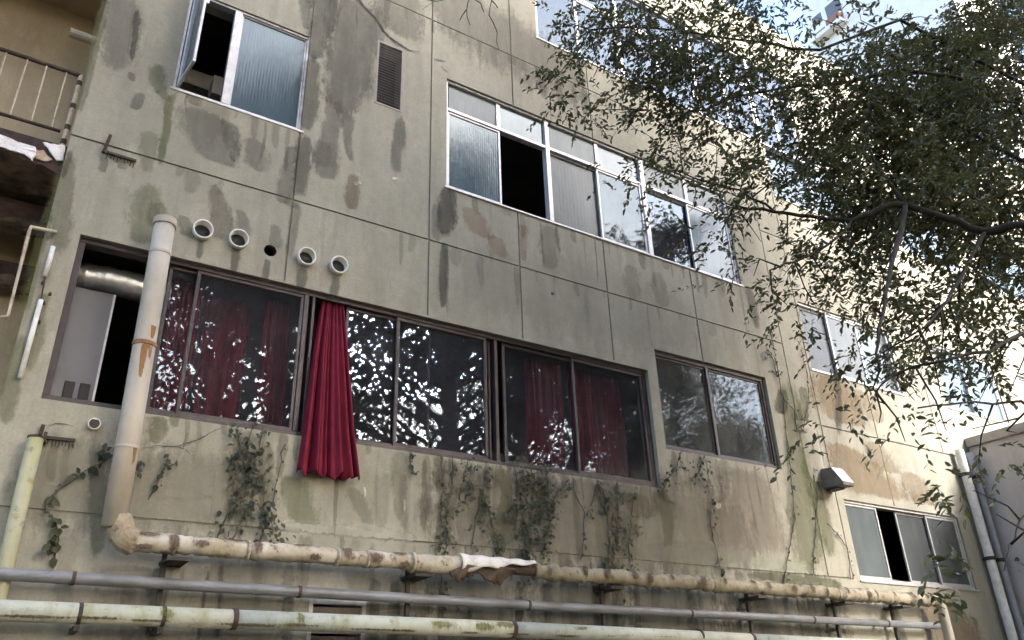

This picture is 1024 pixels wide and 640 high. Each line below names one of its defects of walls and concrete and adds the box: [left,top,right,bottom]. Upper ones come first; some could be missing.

water stain [438,189,457,233]
water stain [439,247,448,298]
corrosion [139,325,156,377]
water stain [829,443,920,502]
corrosion [136,532,179,551]
corrosion [369,552,411,567]